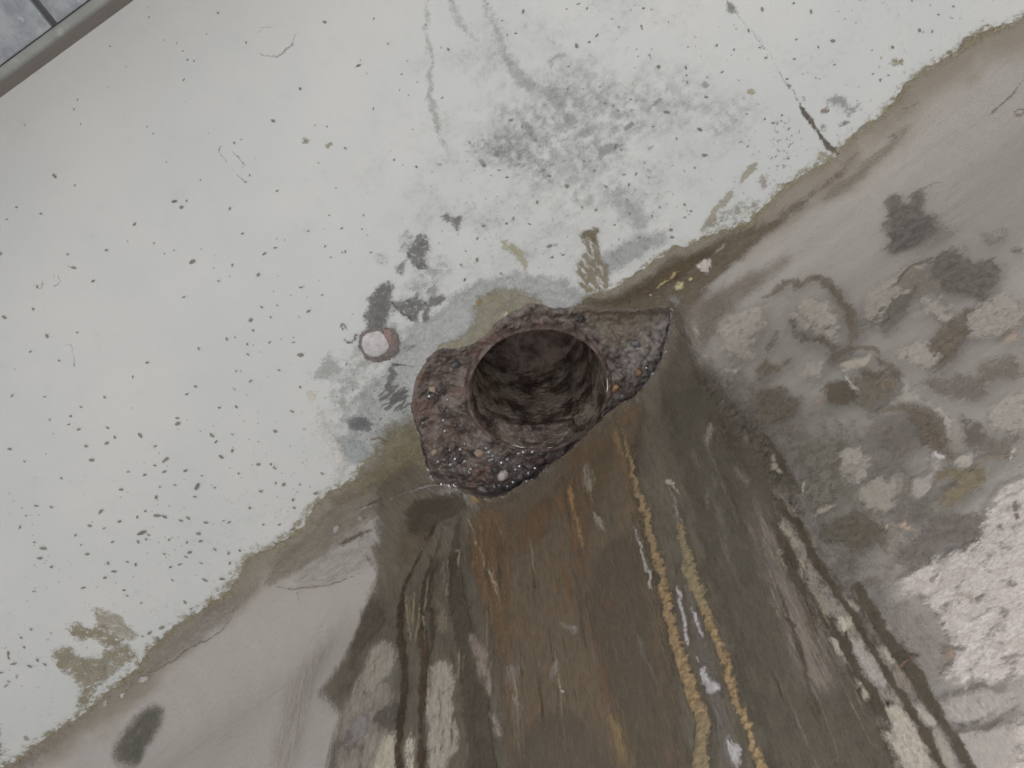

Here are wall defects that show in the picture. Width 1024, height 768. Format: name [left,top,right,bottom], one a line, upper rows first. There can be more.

damp [472,57,622,166]
crack [781,75,839,155]
rust [436,287,542,351]
damp [150,143,1024,768]
flaking render [896,478,1024,768]
damp [113,708,163,765]